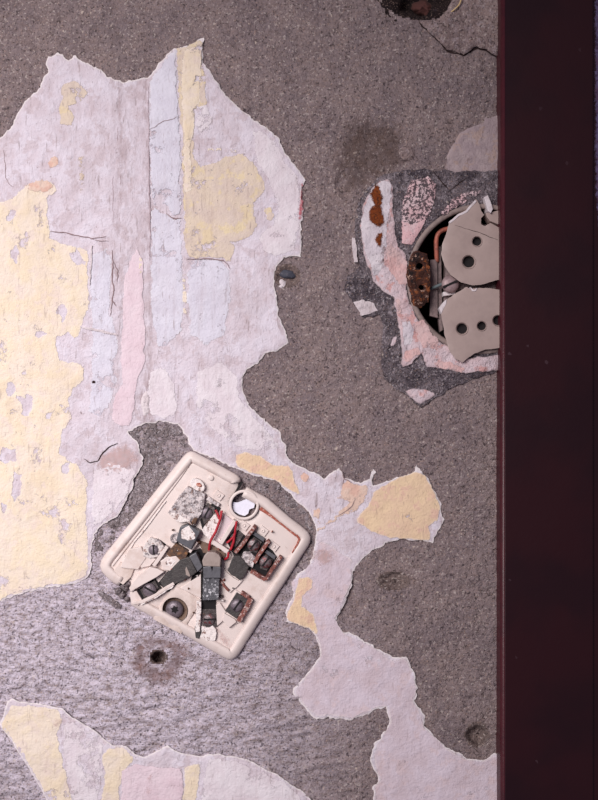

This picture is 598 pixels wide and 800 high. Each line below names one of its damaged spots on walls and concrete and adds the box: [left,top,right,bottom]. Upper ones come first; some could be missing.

flaking render [377,0,498,56]
crack [419,21,497,58]
corrosion [369,184,384,246]
peeling [0,38,498,800]